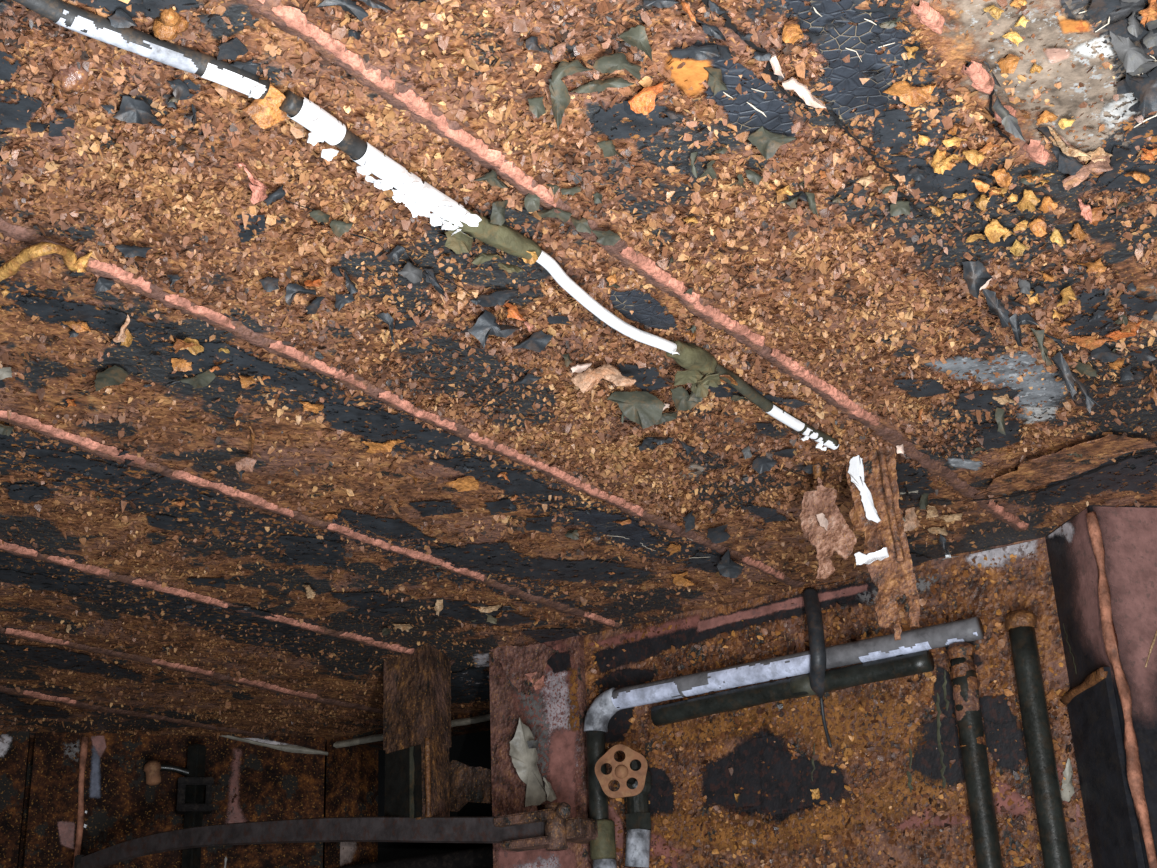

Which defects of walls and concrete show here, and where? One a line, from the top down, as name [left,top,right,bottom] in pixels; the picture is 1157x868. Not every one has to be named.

peeling [72,0,220,28]
corrosion [152,7,189,41]
corrosion [242,77,291,129]
peeling [526,25,683,158]
crack [680,0,929,219]
peeling [926,0,1157,222]
corrosion [0,242,93,308]
corrosion [113,314,133,347]
peeling [894,258,1157,470]
corrosion [235,426,257,479]
peeling [0,274,744,643]
peeling [896,434,1157,566]